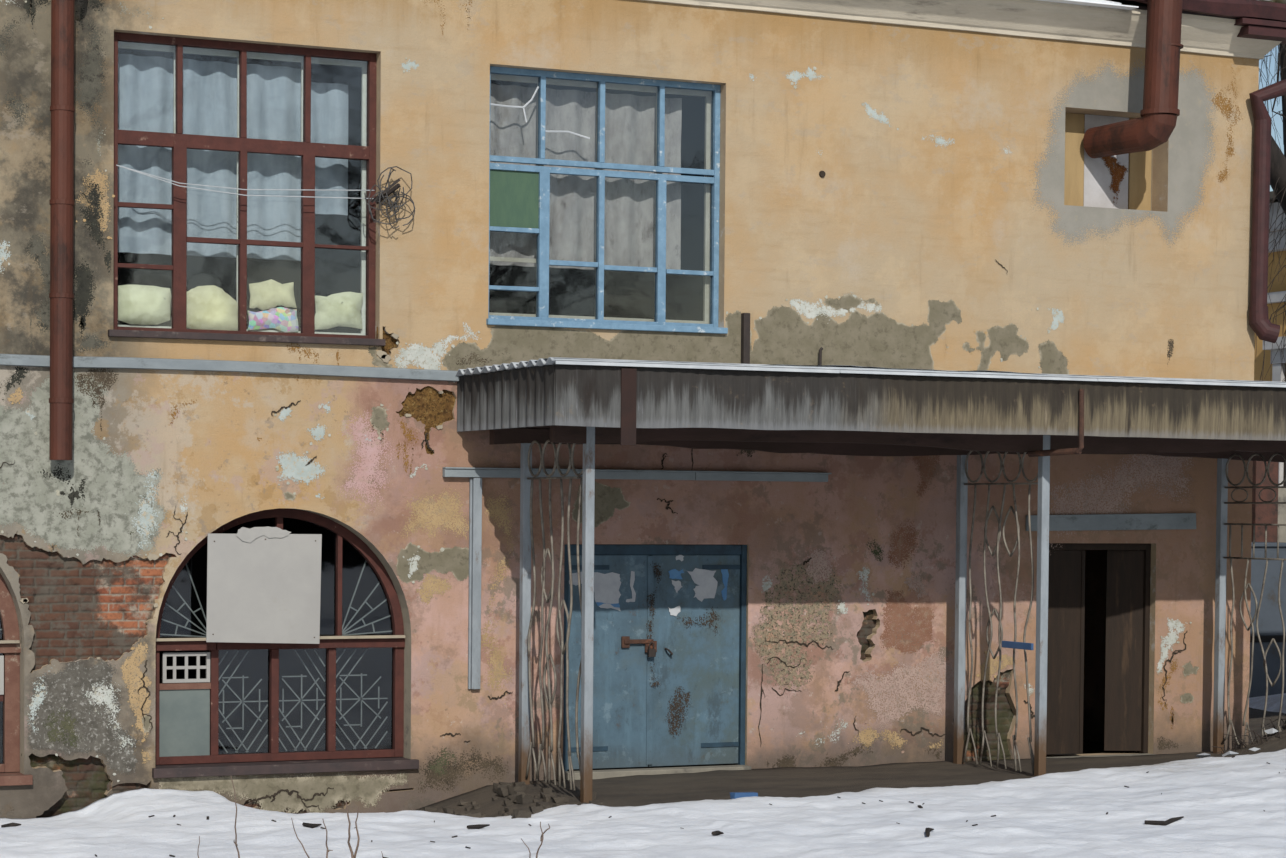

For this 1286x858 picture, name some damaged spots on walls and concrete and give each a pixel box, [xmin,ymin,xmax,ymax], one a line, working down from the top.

damp [74,0,109,131]
corrosion [1102,156,1127,206]
corrosion [1212,67,1240,182]
damp [24,233,50,350]
damp [73,158,112,353]
damp [74,368,118,442]
crack [271,400,301,416]
peeling [274,402,331,501]
flaking render [365,292,1069,478]
crack [167,506,188,554]
spalling [0,530,423,818]
spalling [748,549,883,690]